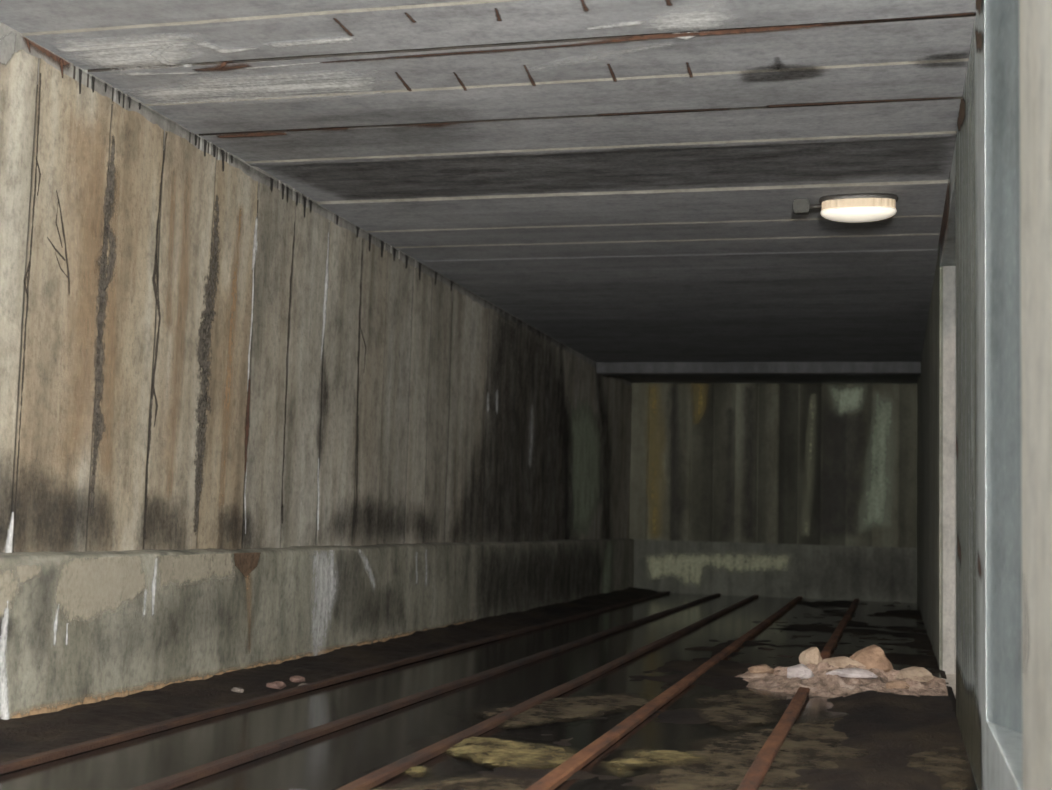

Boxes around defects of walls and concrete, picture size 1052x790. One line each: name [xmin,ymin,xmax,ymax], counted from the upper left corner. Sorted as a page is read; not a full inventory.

corrosion [321,12,976,63]
damp [745,61,819,81]
crack [12,73,70,553]
crack [144,132,167,538]
damp [247,220,257,391]
damp [321,234,329,415]
damp [0,475,110,553]
damp [142,500,181,545]
damp [333,500,433,538]
damp [452,317,601,608]
damp [647,553,789,585]
damp [0,601,11,720]